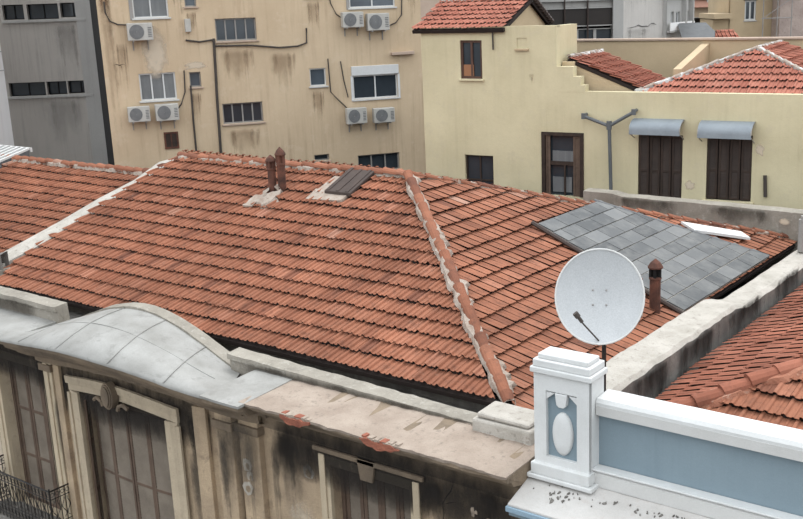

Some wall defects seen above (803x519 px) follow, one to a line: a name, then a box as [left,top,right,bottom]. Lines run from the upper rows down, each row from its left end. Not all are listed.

leakage [778,270,798,296]
leakage [732,297,760,328]
leakage [684,330,712,370]
leakage [638,365,666,396]
peeling [281,410,313,422]
peeling [361,432,403,447]